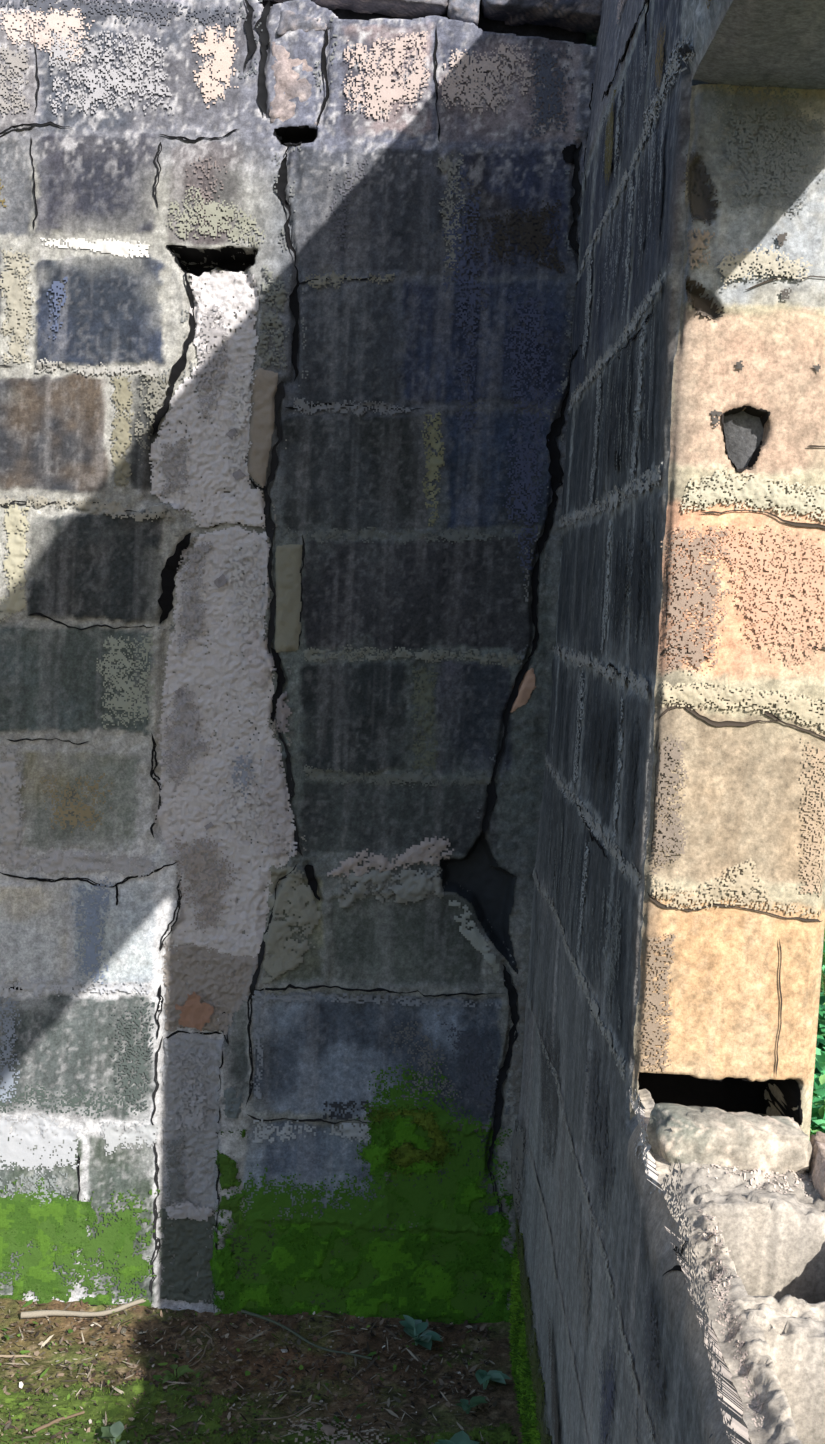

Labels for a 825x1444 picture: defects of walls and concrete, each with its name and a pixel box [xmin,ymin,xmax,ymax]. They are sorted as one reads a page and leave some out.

crack [0,23,72,230]
crack [153,0,271,208]
peeling [167,186,288,251]
crack [318,27,330,123]
peeling [135,361,192,465]
spalling [226,265,308,527]
spalling [263,544,302,674]
crack [482,345,582,837]
crack [28,145,526,1297]
crack [0,735,182,951]
peeling [629,1087,764,1444]
peeling [700,1164,816,1196]